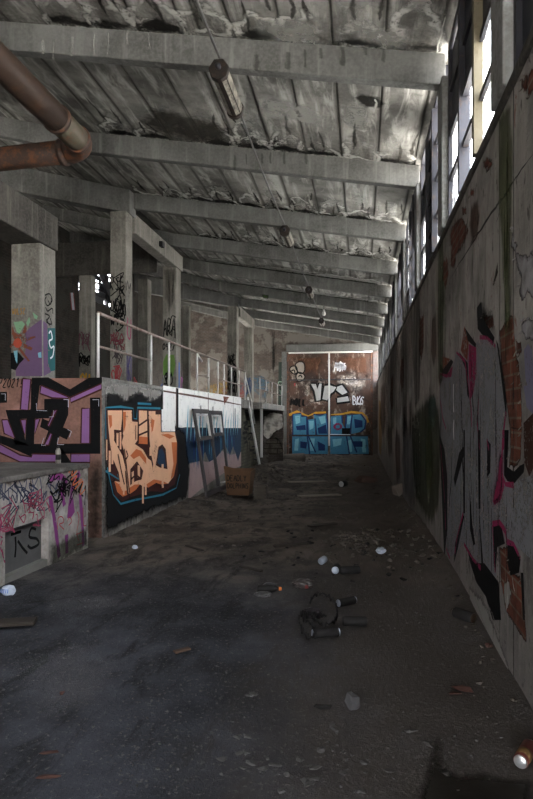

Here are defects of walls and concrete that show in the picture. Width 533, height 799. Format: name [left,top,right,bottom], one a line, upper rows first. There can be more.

water stain [86,98,419,164]
flaking render [481,315,533,437]
flaking render [499,547,526,642]